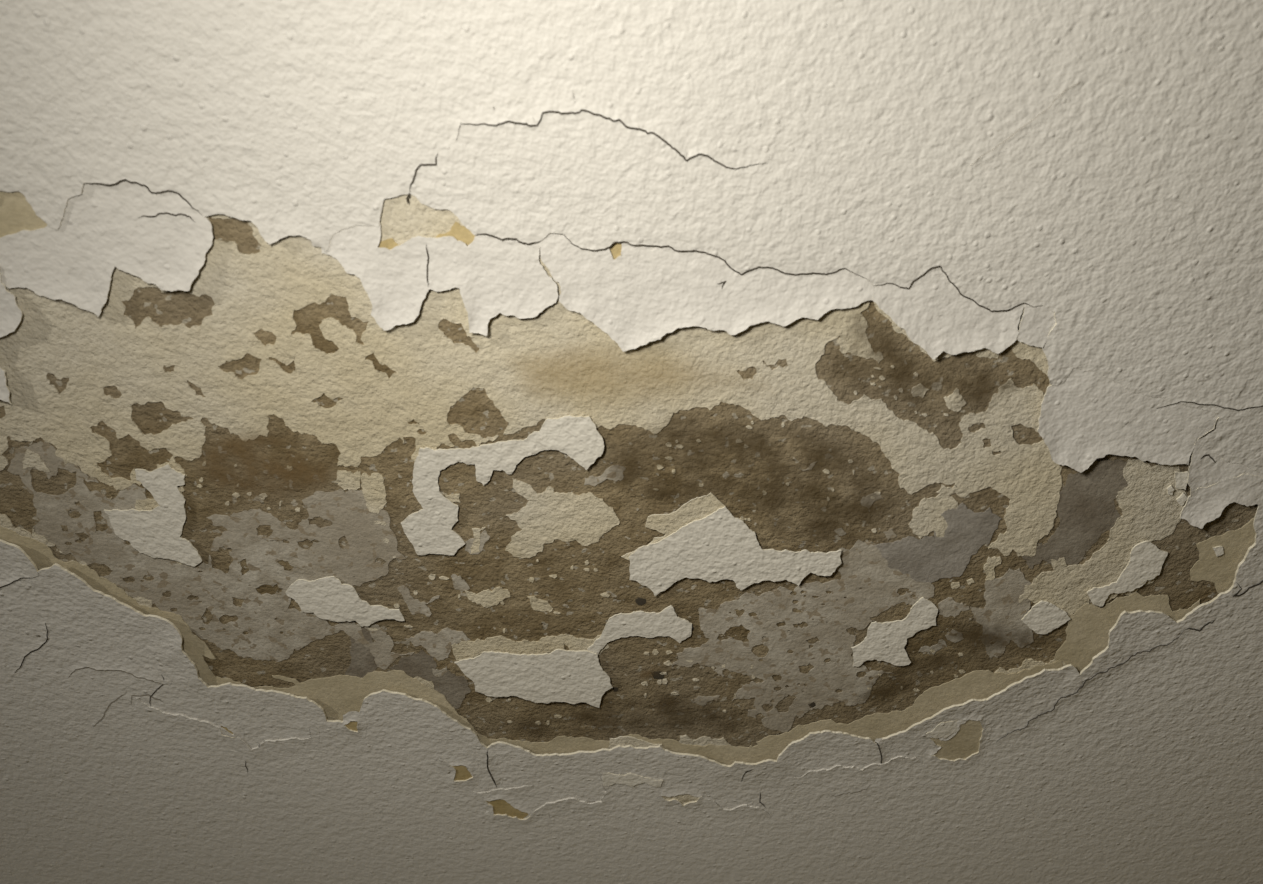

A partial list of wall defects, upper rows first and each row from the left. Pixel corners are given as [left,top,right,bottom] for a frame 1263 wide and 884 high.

crack [406,87,770,203]
peeling [0,179,1263,771]
crack [0,569,38,588]
crack [9,623,48,673]
crack [65,655,172,726]
spalling [435,751,536,830]
spalling [602,772,709,816]